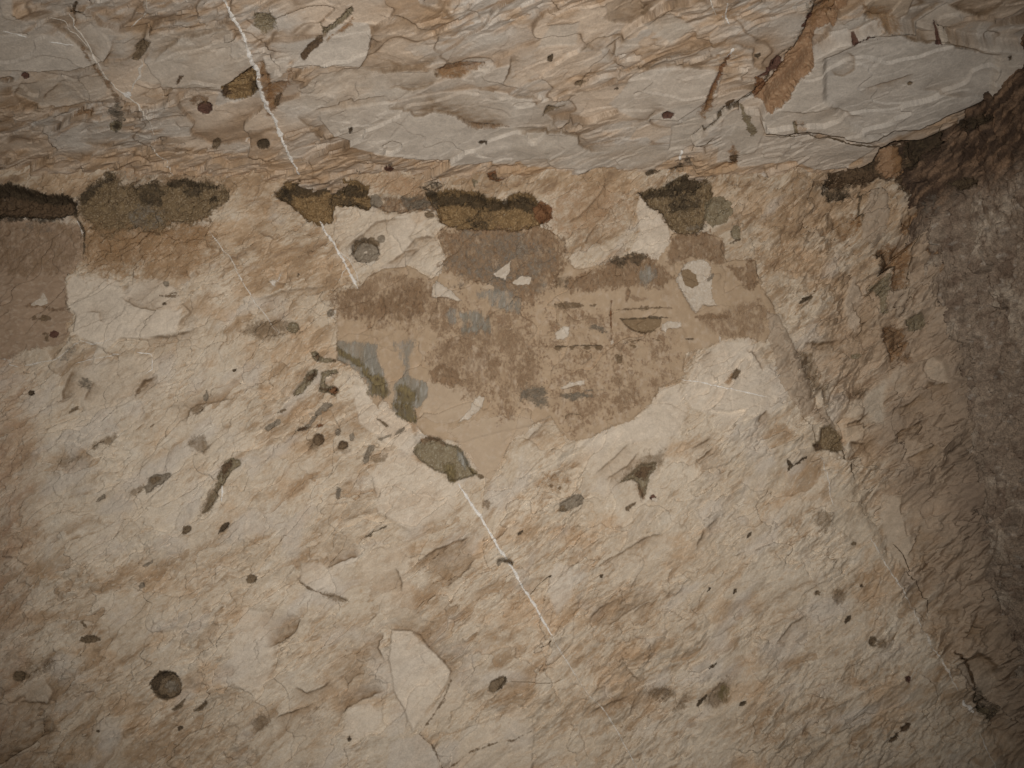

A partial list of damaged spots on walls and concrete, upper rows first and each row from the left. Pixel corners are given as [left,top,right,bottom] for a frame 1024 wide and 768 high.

leakage [438,193,759,311]
leakage [337,341,428,422]
leakage [520,386,547,406]
leakage [446,452,467,482]
crack [301,583,347,601]